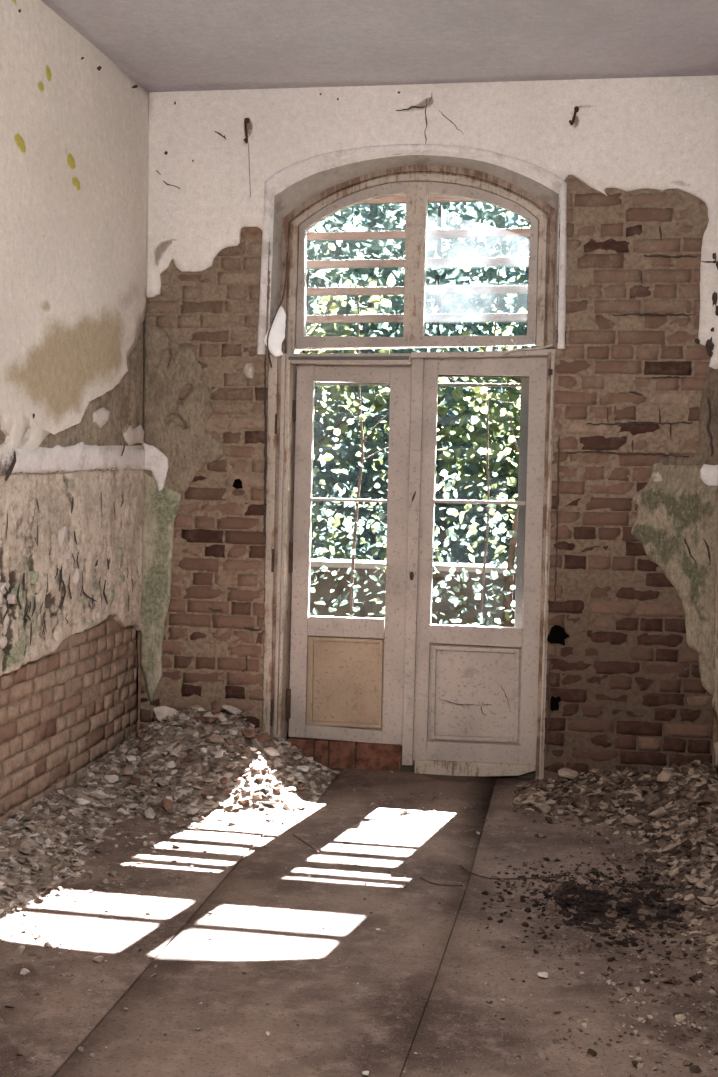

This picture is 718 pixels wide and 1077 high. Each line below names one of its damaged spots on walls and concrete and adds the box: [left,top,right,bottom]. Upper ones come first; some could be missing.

crack [396,93,464,143]
leakage [154,239,177,270]
leakage [0,275,142,435]
spalling [0,238,271,822]
spalling [543,175,718,780]